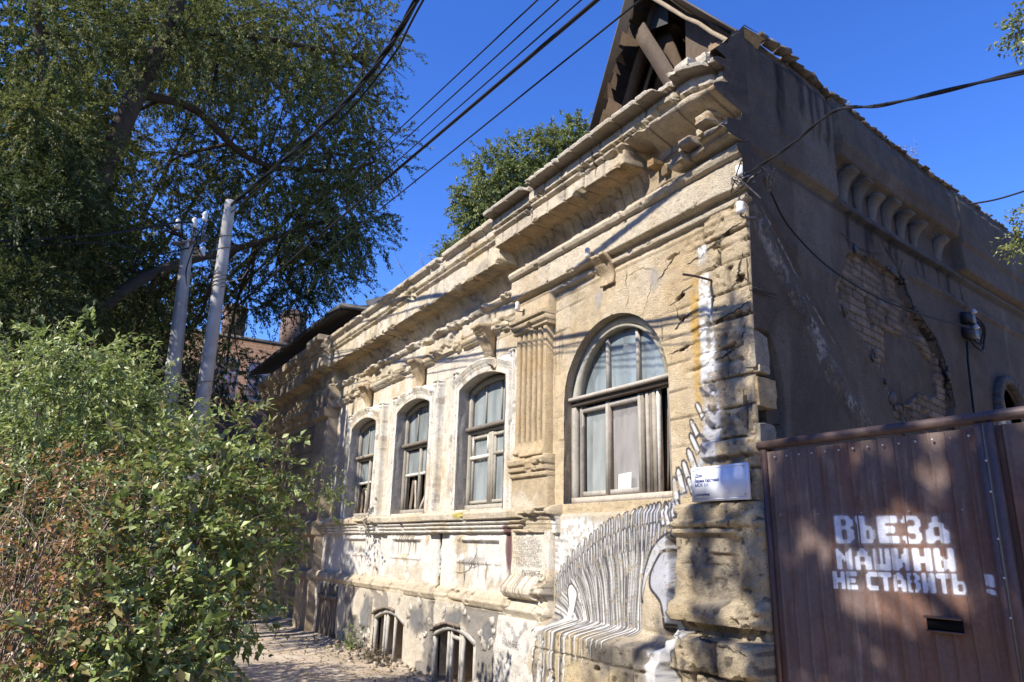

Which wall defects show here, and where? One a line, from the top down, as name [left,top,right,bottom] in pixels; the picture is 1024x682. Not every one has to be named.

crack [625,221,777,363]
flaking render [835,245,959,436]